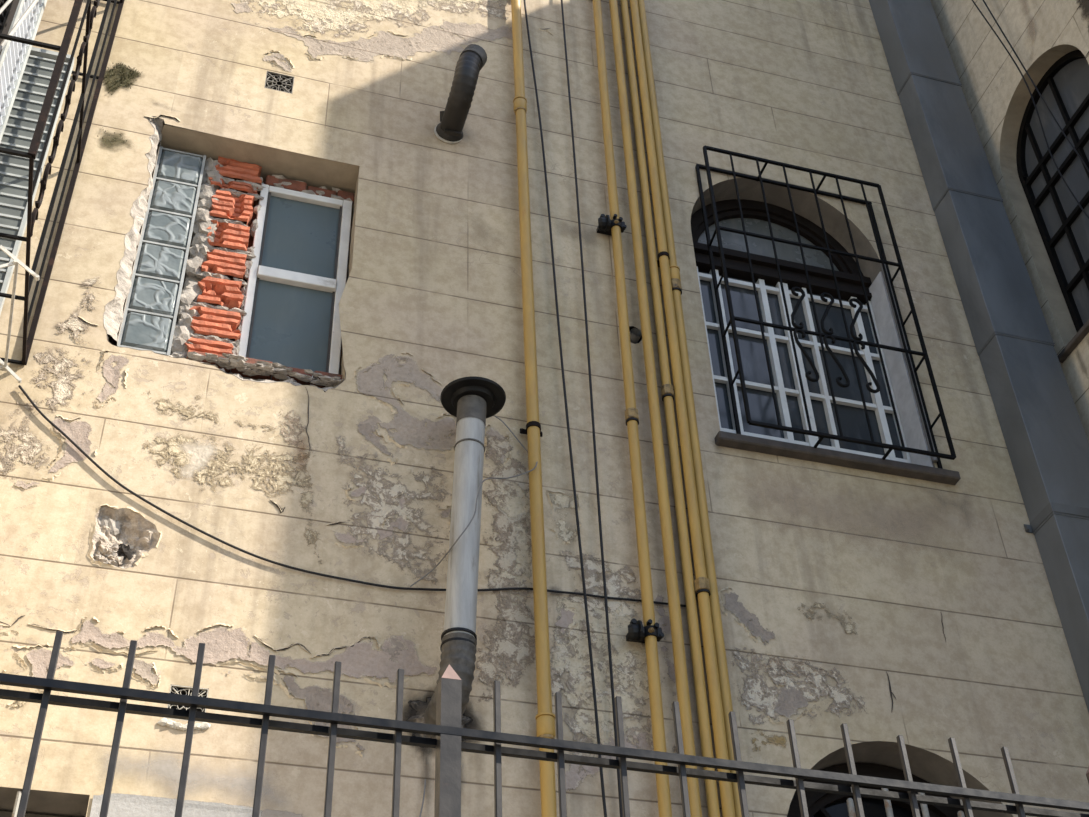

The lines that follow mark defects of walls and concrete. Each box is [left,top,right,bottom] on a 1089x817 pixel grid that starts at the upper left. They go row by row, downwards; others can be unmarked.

peeling [263,50,295,72]
peeling [232,0,513,64]
peeling [0,277,129,481]
spalling [87,503,162,569]
peeling [148,391,220,423]
peeling [141,410,322,564]
peeling [334,352,456,584]
peeling [476,424,536,702]
peeling [0,617,437,758]
peeling [546,489,676,790]
peeling [718,587,865,725]